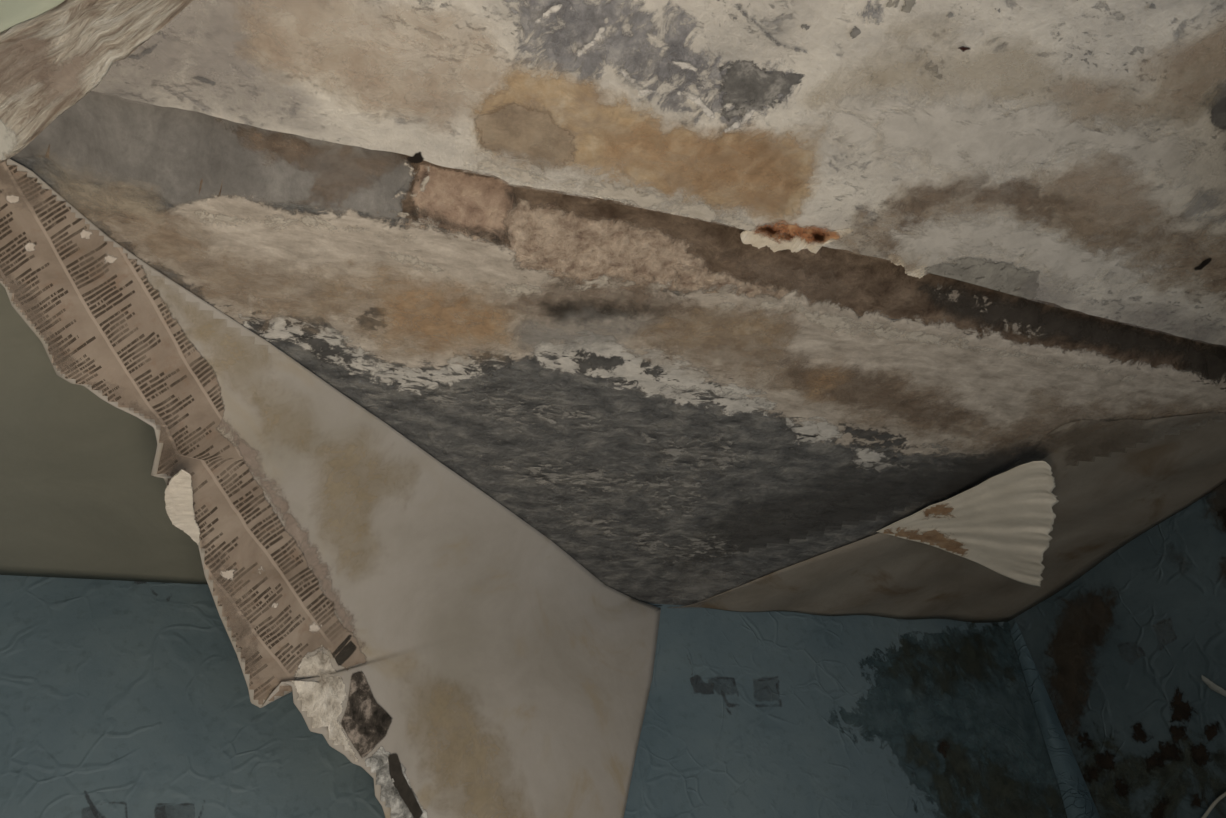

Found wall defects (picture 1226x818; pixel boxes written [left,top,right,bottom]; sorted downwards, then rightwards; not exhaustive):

leakage [474,70,814,220]
peeling [505,0,804,133]
peeling [850,0,915,39]
leakage [1200,81,1226,130]
corrosion [740,221,854,254]
leakage [837,162,1226,297]
leakage [65,186,1226,568]
peeling [164,469,200,545]
leakage [829,622,1067,818]
leakage [1047,589,1226,818]